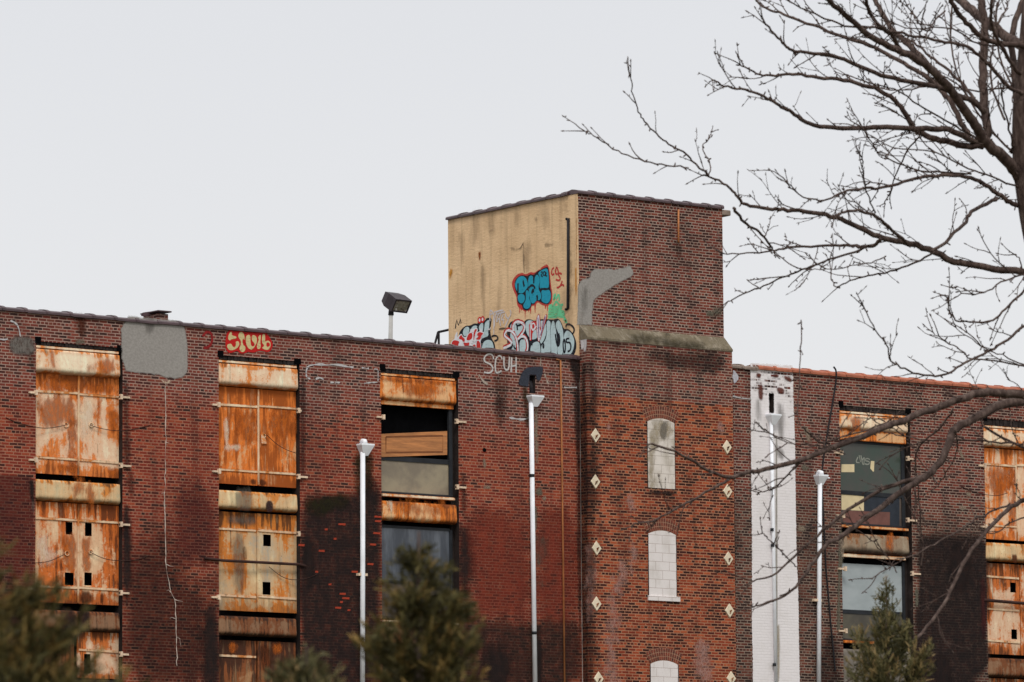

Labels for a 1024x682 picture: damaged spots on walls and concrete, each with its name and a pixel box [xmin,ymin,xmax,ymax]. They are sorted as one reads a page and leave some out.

peeling [757,373,791,399]
corrosion [39,351,117,501]
corrosion [225,411,255,449]
corrosion [989,466,1016,530]
corrosion [38,535,90,571]
corrosion [47,591,103,631]